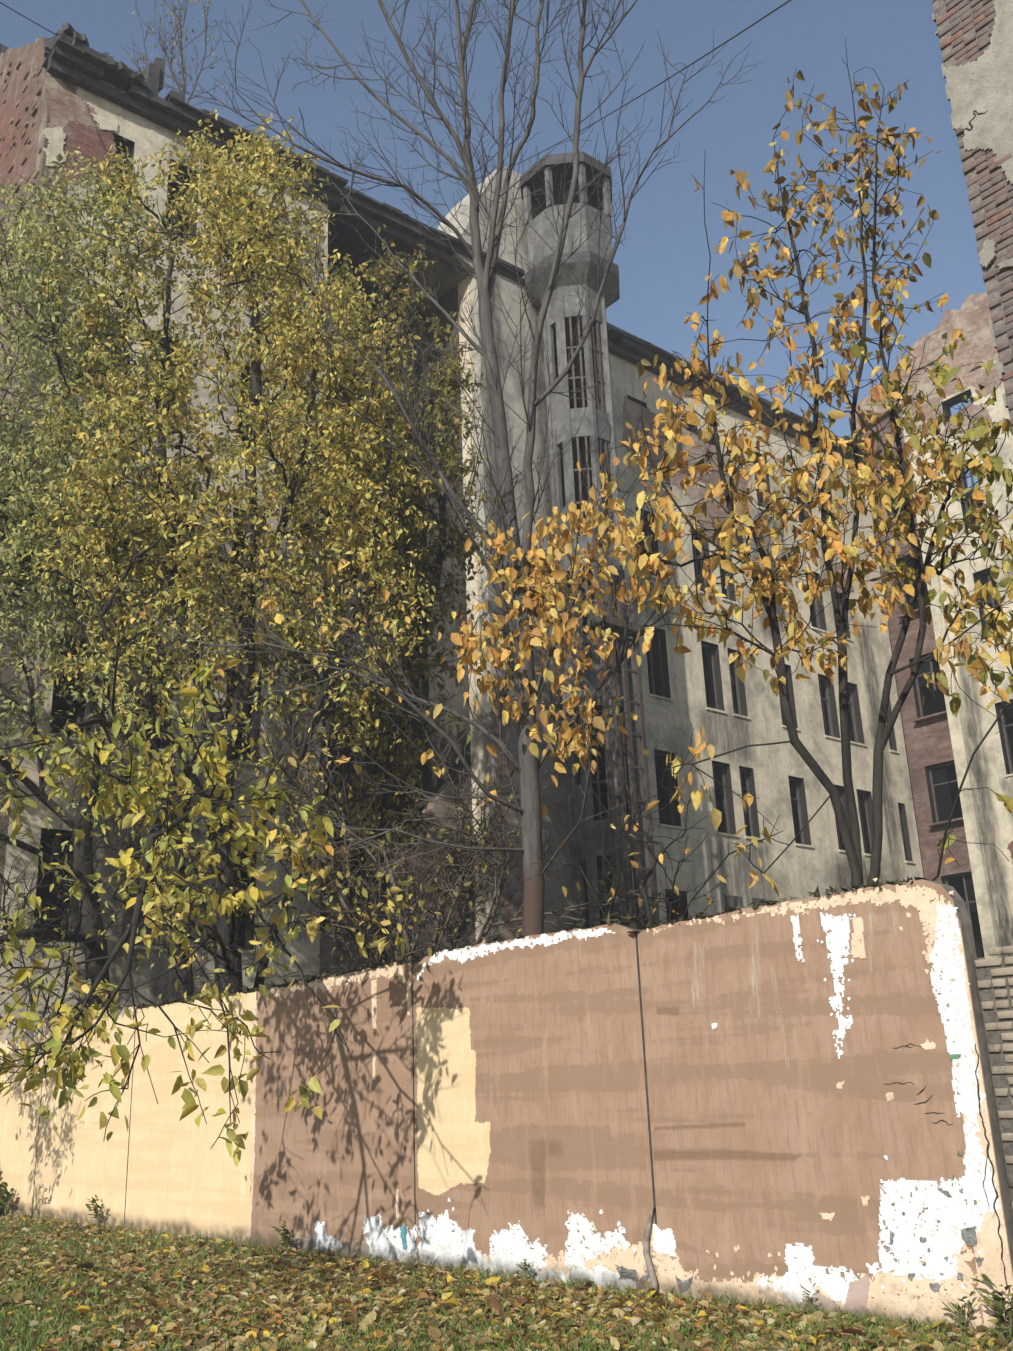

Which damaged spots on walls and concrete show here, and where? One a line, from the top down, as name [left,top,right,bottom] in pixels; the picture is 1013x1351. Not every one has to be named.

flaking render [45,77,118,218]
flaking render [903,127,1013,437]
flaking render [932,0,996,67]
flaking render [246,698,615,1238]
peeling [283,878,1013,1335]